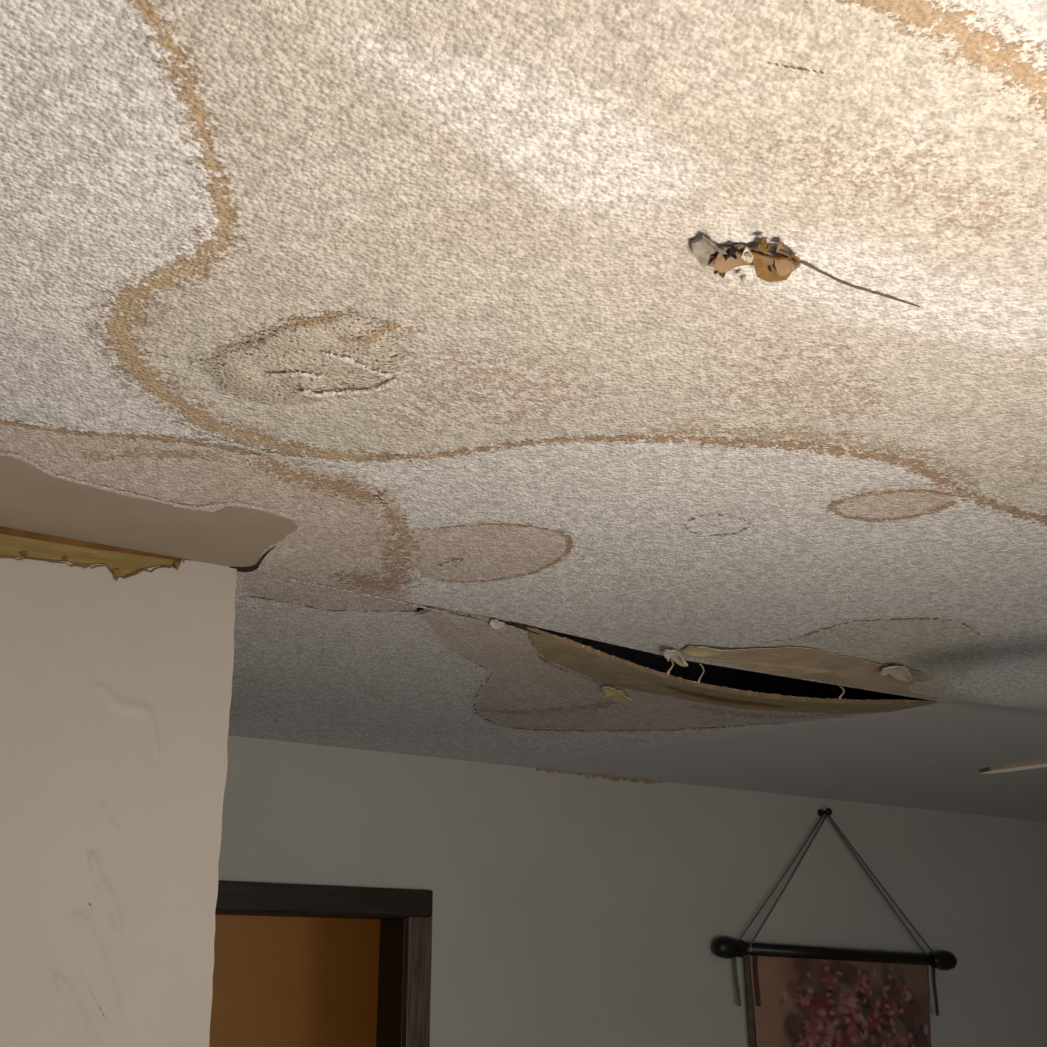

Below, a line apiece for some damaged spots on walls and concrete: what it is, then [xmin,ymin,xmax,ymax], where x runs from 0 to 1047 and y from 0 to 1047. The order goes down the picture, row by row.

leakage [0,0,1047,732]
spalling [691,235,920,307]